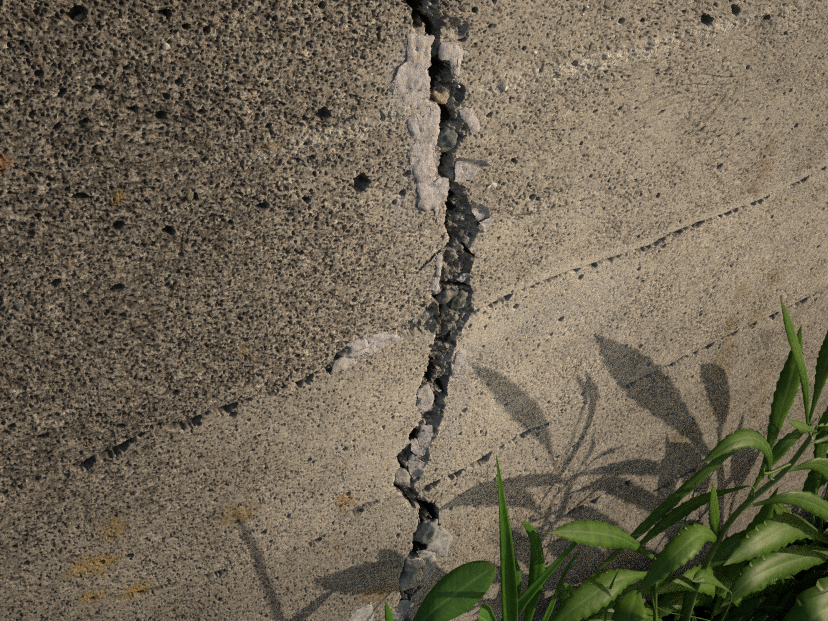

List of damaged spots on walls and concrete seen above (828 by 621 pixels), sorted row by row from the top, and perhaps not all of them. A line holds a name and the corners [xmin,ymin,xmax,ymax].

peeling [387,13,493,216]
peeling [471,200,501,232]
peeling [329,253,443,373]
crack [393,0,828,621]
crack [113,503,384,602]